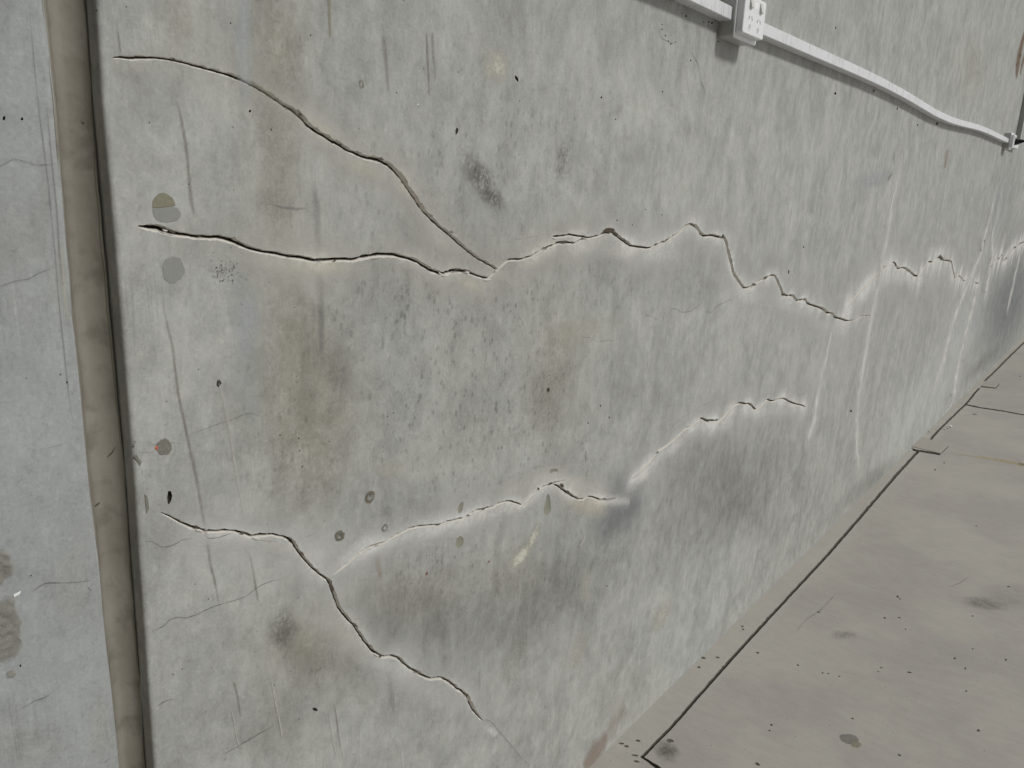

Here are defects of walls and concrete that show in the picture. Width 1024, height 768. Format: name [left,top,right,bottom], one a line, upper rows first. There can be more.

crack [113,55,1024,339]
crack [151,388,809,762]